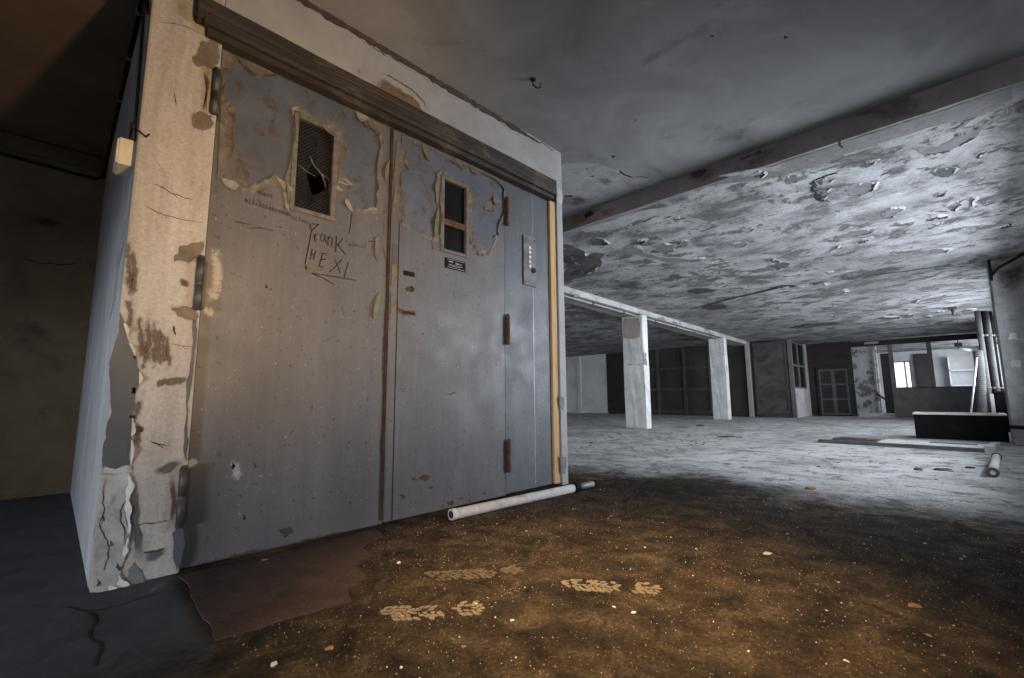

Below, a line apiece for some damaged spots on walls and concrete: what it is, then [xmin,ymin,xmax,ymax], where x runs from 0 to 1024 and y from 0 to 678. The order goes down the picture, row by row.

peeling [217,49,505,258]
peeling [557,155,707,263]
peeling [781,172,810,185]
peeling [844,181,880,197]
peeling [829,206,906,253]
peeling [923,166,989,230]
peeling [912,106,1015,159]
peeling [623,305,666,339]
flaking render [876,299,977,325]
peeling [183,319,197,461]
flaking render [90,313,146,592]
flaking render [172,528,185,570]